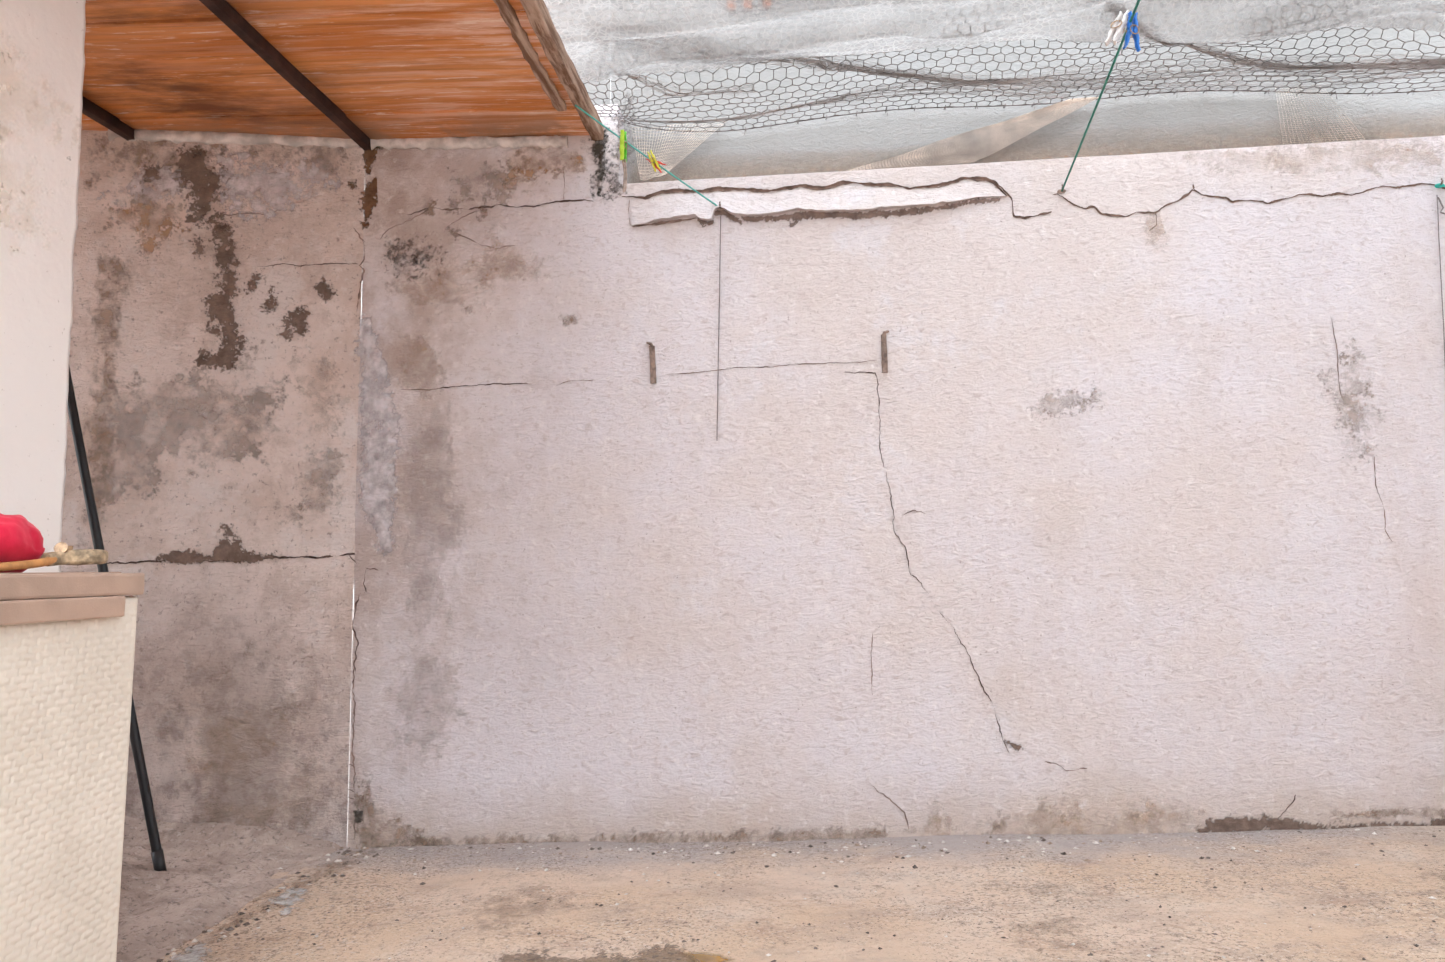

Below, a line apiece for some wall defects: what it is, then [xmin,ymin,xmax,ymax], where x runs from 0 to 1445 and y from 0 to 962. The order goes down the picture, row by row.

damp [86,140,184,211]
damp [194,144,345,218]
damp [94,257,124,340]
damp [384,236,447,280]
crack [257,170,590,309]
damp [89,358,287,508]
crack [377,380,592,459]
crack [667,360,1087,771]
crack [107,523,377,847]